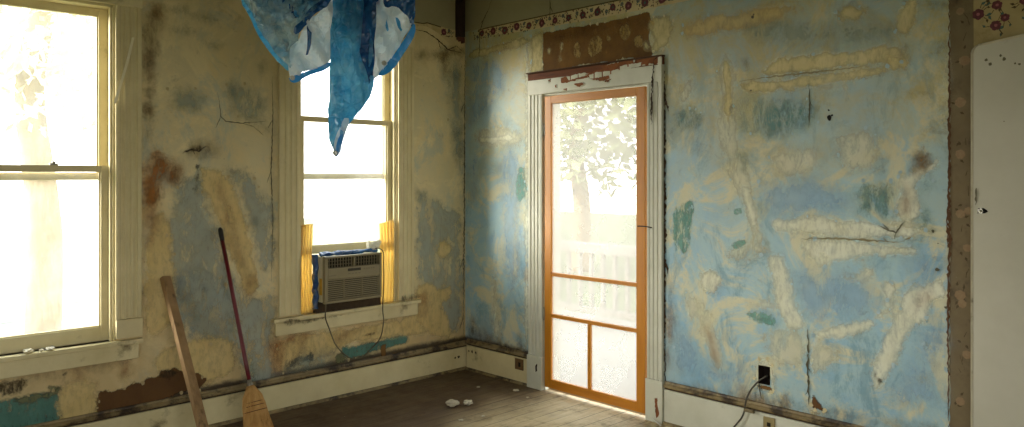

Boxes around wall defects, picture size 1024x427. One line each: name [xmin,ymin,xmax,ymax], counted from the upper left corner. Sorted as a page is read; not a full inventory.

spalling [529,12,665,91]
crack [739,66,863,123]
crack [185,84,273,277]
crack [805,221,911,243]
spalling [95,368,206,412]
crack [804,330,812,403]
spalling [809,395,827,413]